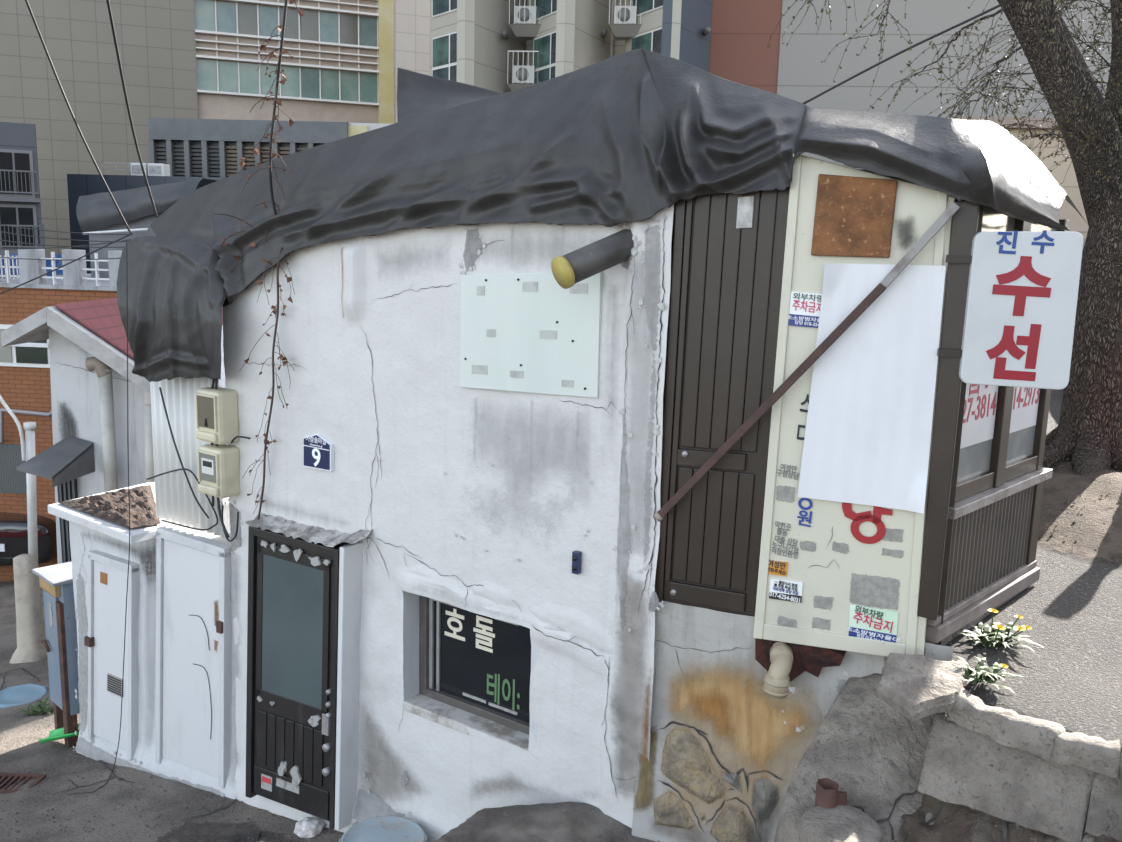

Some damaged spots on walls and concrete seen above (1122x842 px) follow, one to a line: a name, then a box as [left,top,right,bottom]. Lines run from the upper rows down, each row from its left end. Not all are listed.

spalling [459,224,486,275]
crack [360,327,483,606]
crack [562,214,665,600]
rust [676,674,811,818]